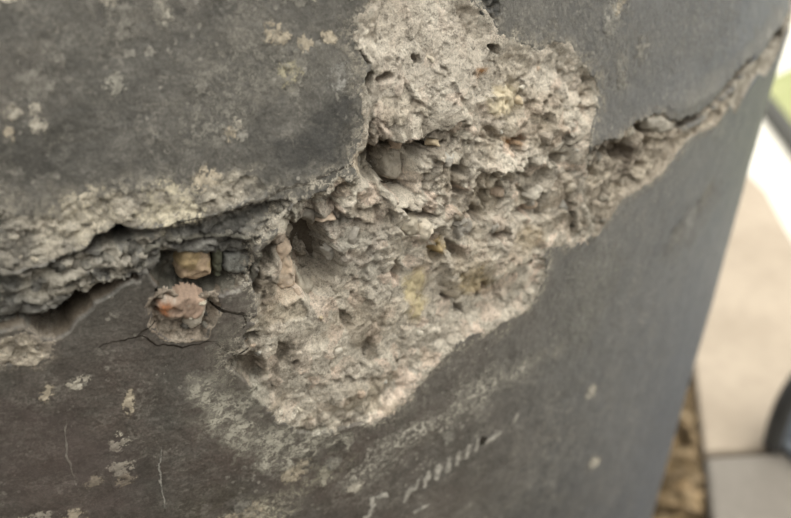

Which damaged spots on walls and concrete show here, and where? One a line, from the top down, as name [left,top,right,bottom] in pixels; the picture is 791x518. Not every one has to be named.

peeling [99,0,157,61]
peeling [1,50,66,154]
spalling [0,165,265,278]
spalling [140,0,791,447]
spalling [0,309,58,369]
crack [99,320,249,372]
crack [207,300,254,329]
peeling [38,384,55,404]
peeling [65,374,91,390]
peeling [122,388,135,418]
peeling [84,431,137,489]
peeling [280,456,342,487]